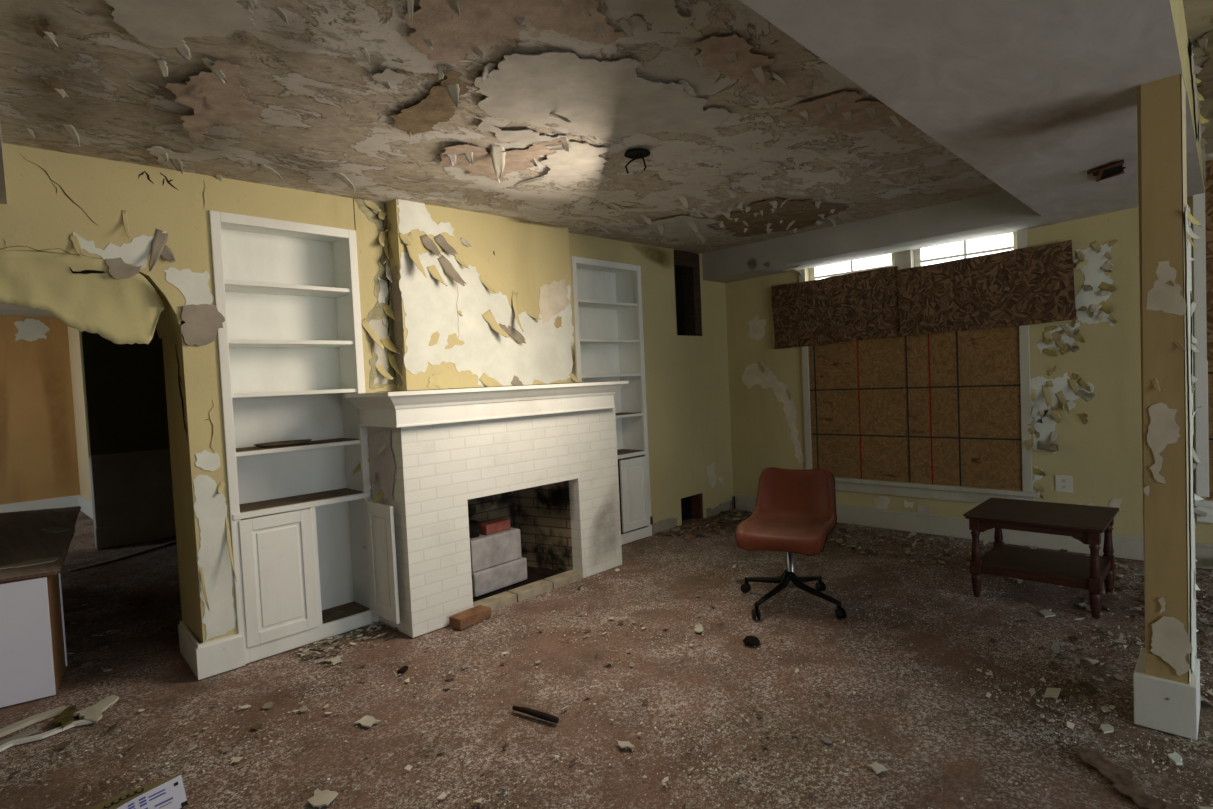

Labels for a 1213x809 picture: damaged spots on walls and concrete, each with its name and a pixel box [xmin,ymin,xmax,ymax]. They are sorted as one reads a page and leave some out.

peeling [105,0,289,145]
peeling [389,0,731,187]
peeling [1190,17,1213,161]
peeling [14,319,50,341]
crack [0,238,104,260]
crack [27,160,99,226]
peeling [69,210,225,346]
peeling [332,173,581,390]
peeling [609,188,849,247]
peeling [1025,239,1118,454]
peeling [1144,204,1204,676]
peeling [193,450,237,641]